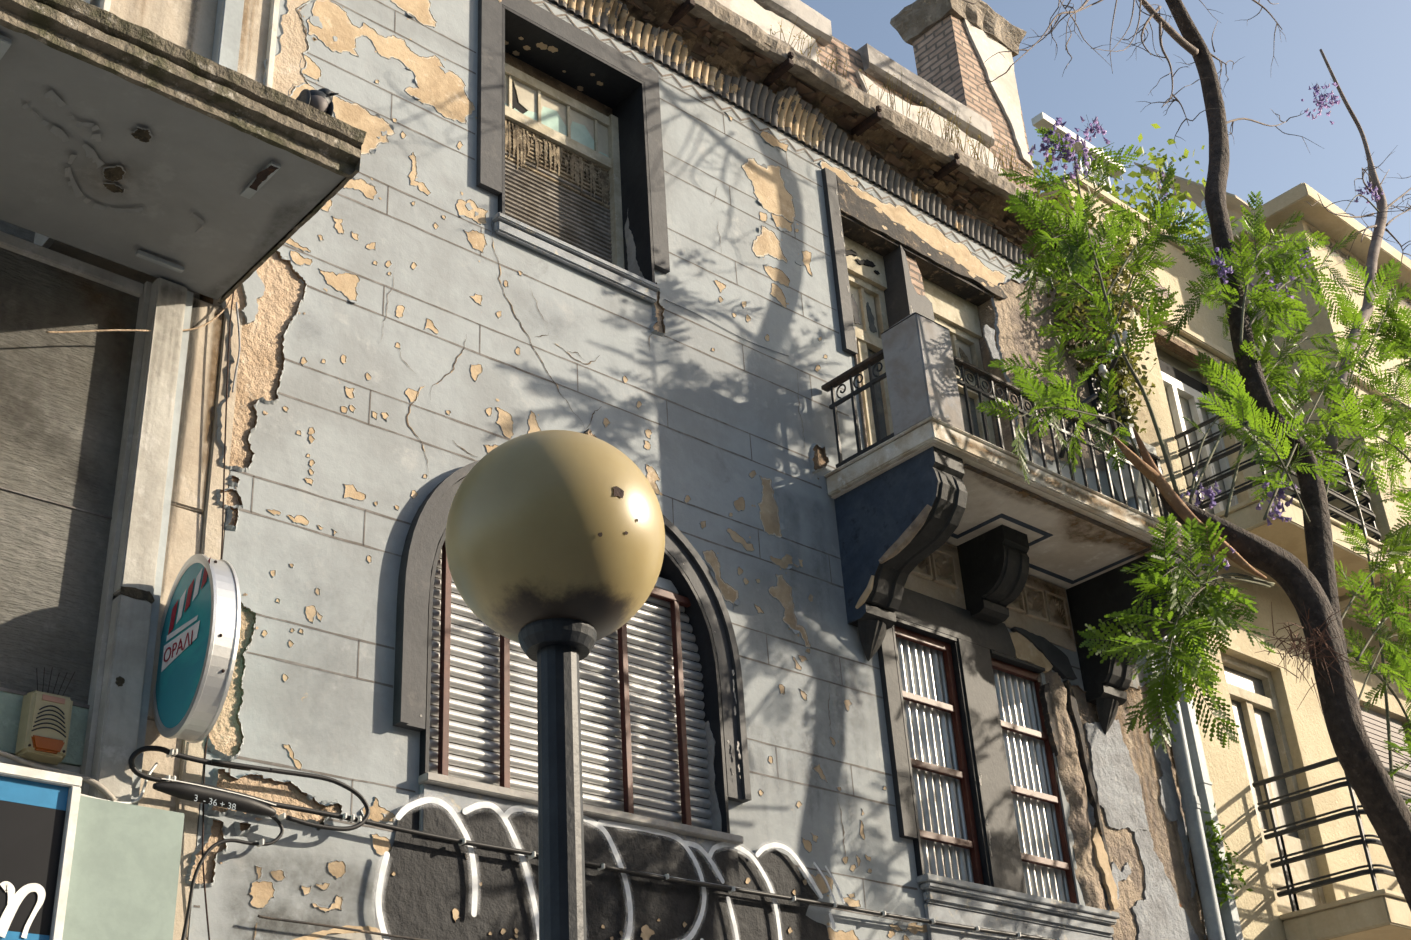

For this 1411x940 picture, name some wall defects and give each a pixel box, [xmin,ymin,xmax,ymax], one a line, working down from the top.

peeling [505,37,558,56]
peeling [266,509,338,537]
flaking render [216,95,431,531]
crack [380,266,476,468]
peeling [423,318,439,335]
crack [491,218,600,429]
peeling [643,429,662,496]
peeling [702,470,813,671]
spalling [619,0,1112,473]
flaking render [185,587,343,889]
peeling [778,684,808,701]
flaking render [1009,627,1208,940]